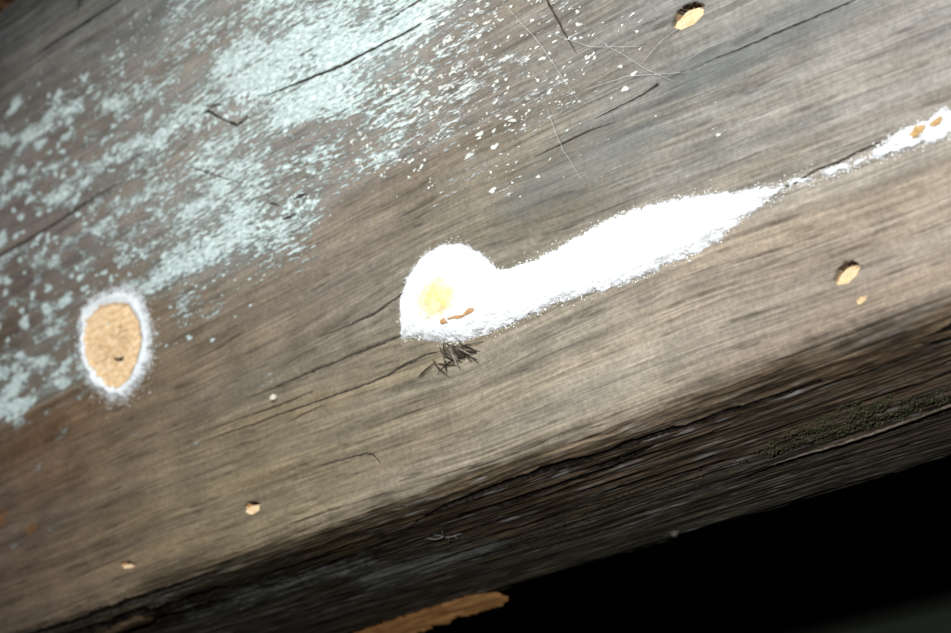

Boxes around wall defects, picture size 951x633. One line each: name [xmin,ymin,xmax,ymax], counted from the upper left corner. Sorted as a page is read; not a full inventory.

crack [201,0,445,126]
crack [546,0,577,54]
damp [397,106,951,347]
damp [71,276,161,410]
crack [920,324,951,345]
crack [29,568,250,633]